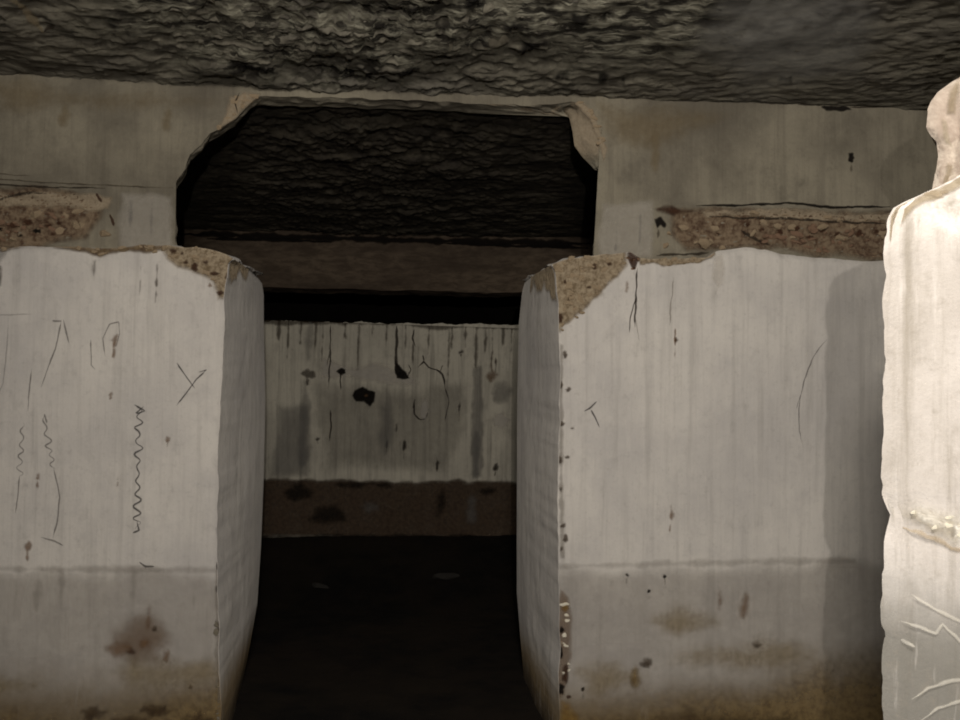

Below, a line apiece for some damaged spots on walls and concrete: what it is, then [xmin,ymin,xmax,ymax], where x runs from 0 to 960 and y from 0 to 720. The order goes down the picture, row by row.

spalling [108,0,751,84]
spalling [530,77,960,331]
spalling [0,184,249,297]
damp [261,479,517,538]
damp [127,689,221,720]
damp [631,661,651,686]
damp [639,665,884,720]